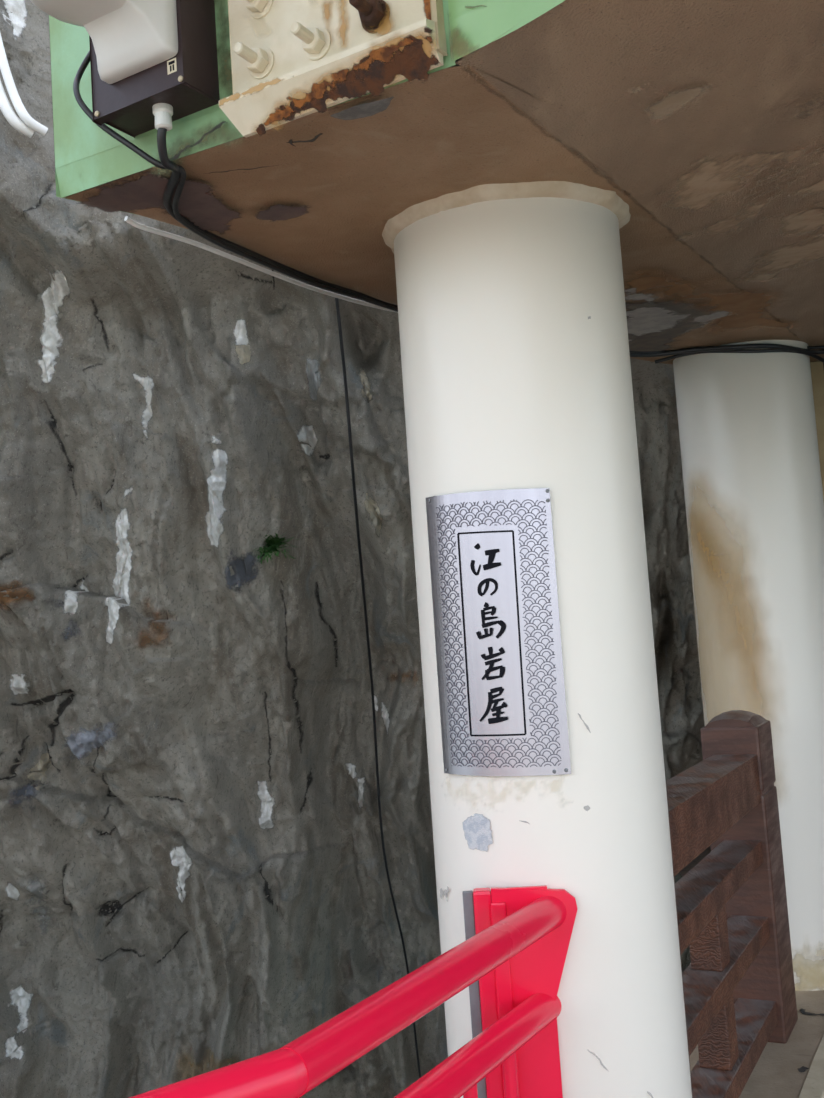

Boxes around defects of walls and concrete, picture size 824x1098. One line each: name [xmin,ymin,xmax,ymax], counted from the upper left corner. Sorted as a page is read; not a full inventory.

corrosion [219,78,281,106]
corrosion [256,0,440,135]
peeling [80,172,241,235]
peeling [667,149,824,236]
spalling [625,300,721,352]
peeling [463,814,493,851]
leakage [792,953,824,991]